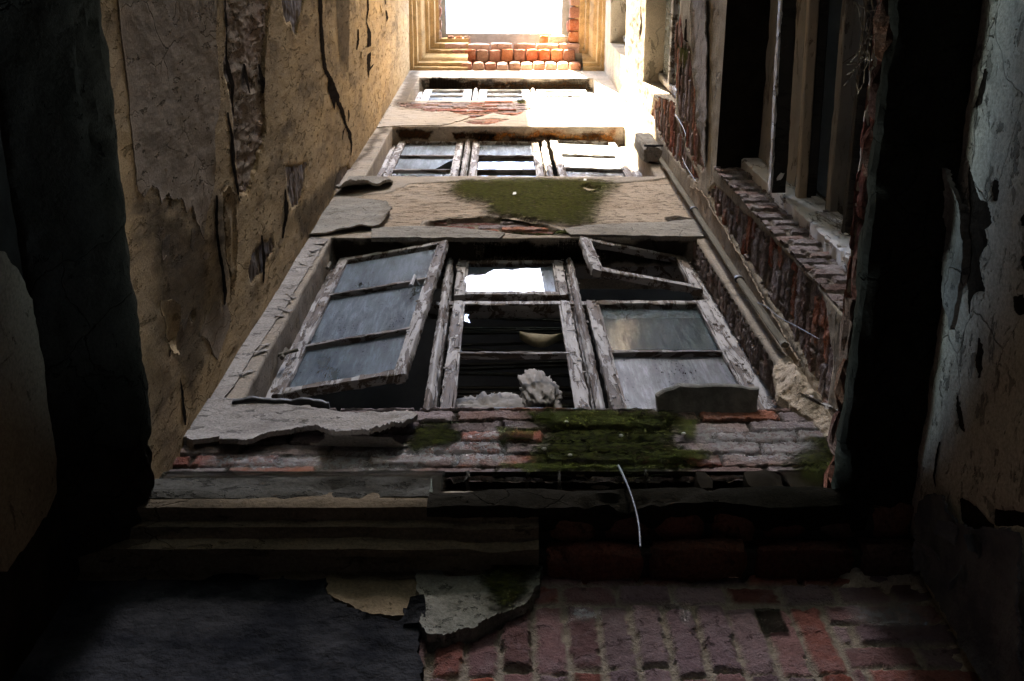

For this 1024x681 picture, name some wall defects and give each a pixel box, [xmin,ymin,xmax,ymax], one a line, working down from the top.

crack [318,0,352,153]
spalling [170,0,834,492]
flaking render [941,166,999,330]
peeling [11,503,920,681]